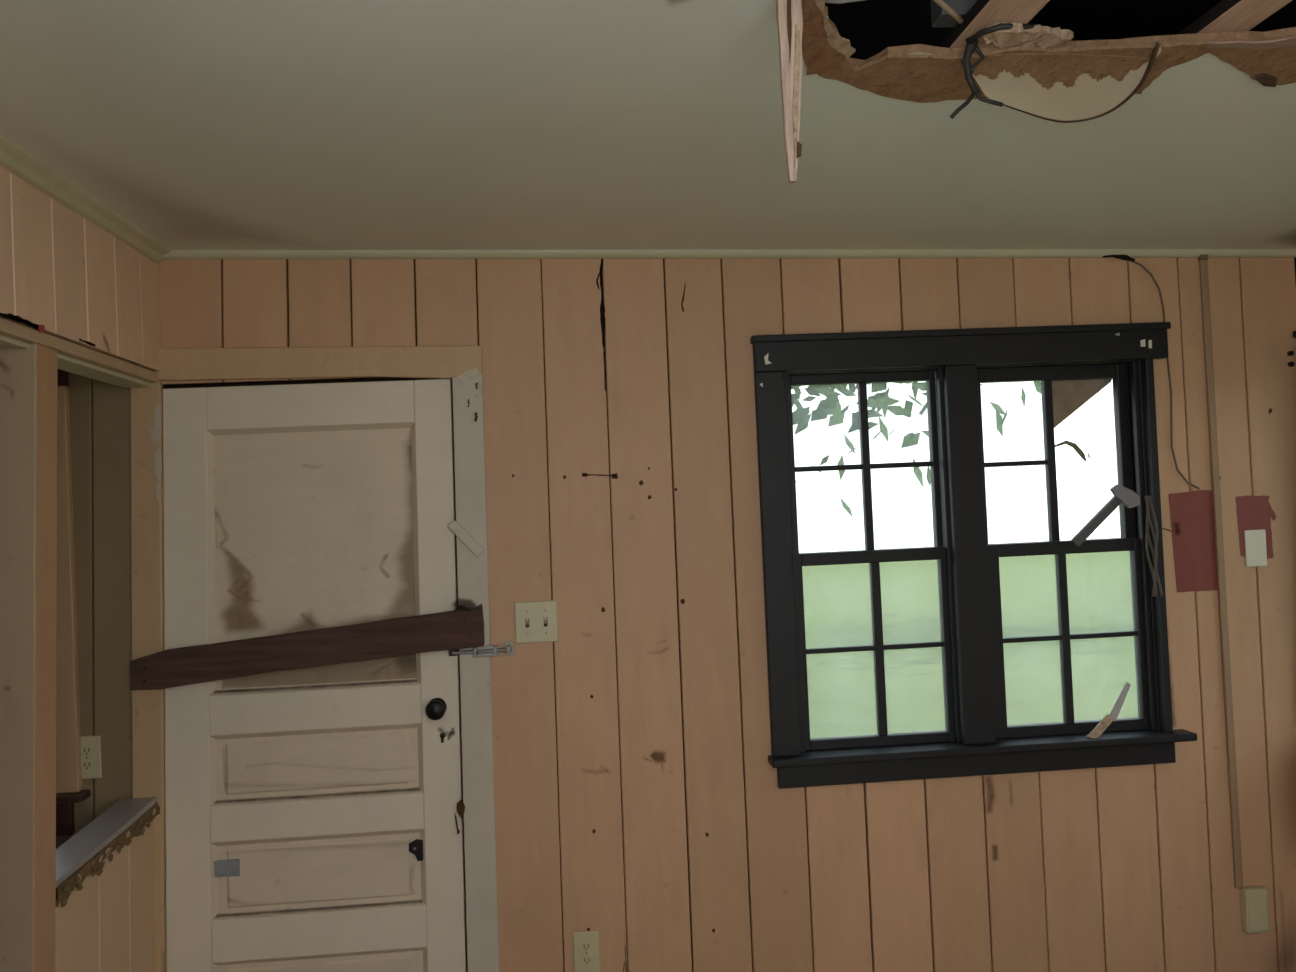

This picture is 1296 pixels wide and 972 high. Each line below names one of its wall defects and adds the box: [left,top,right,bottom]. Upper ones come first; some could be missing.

peeling [801,0,846,75]
peeling [1053,35,1296,94]
crack [596,259,606,391]